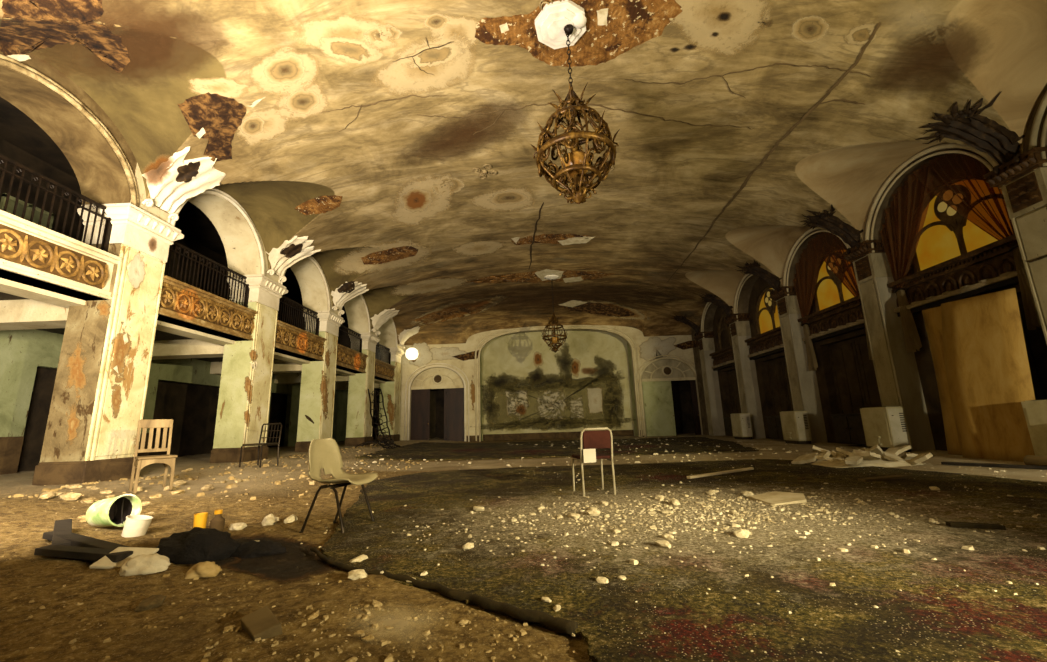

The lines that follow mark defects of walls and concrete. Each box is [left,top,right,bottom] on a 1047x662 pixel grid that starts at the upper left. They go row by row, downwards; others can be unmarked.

spalling [0,0,130,73]
spalling [176,92,265,183]
leakage [190,13,478,145]
crack [321,39,560,135]
spalling [475,0,682,67]
crack [588,103,750,129]
leakage [670,0,771,55]
crack [625,22,882,281]
leakage [791,16,829,43]
crack [529,202,544,269]
peeling [109,322,132,418]
leakage [470,343,630,431]